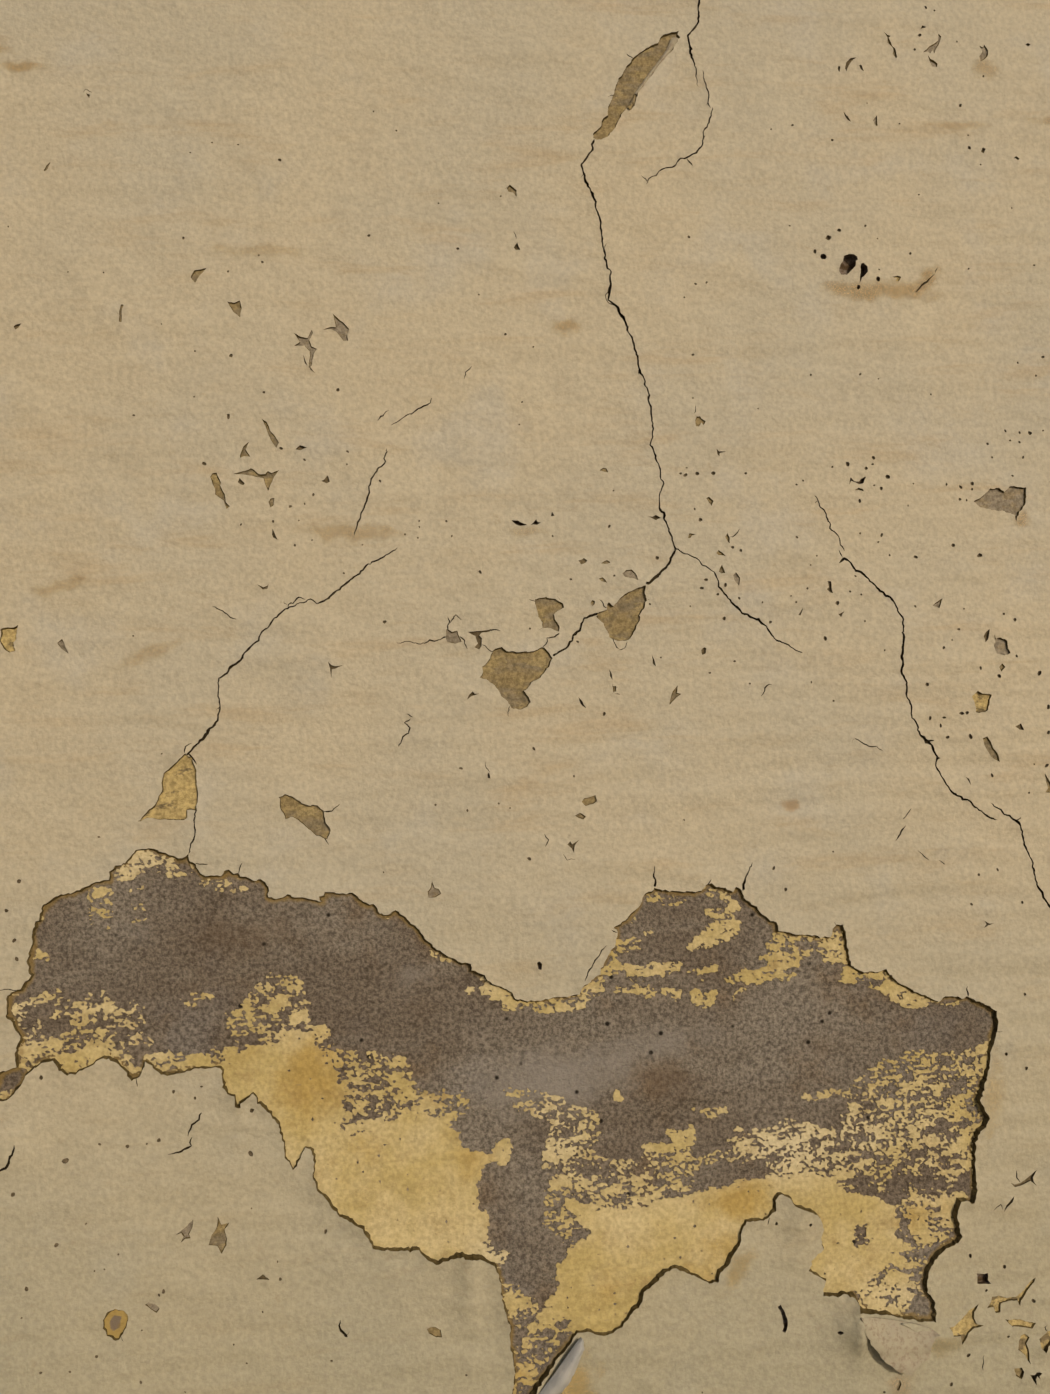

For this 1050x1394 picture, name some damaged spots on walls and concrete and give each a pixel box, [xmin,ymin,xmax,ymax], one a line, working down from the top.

peeling [593,31,680,140]
crack [642,0,713,183]
crack [581,140,802,653]
peeling [974,486,1026,521]
crack [169,398,432,769]
peeling [401,596,564,717]
crack [553,613,598,656]
peeling [591,569,649,650]
crack [815,496,1050,908]
crack [189,811,197,853]
peeling [279,794,340,845]
peeling [0,848,1050,1394]